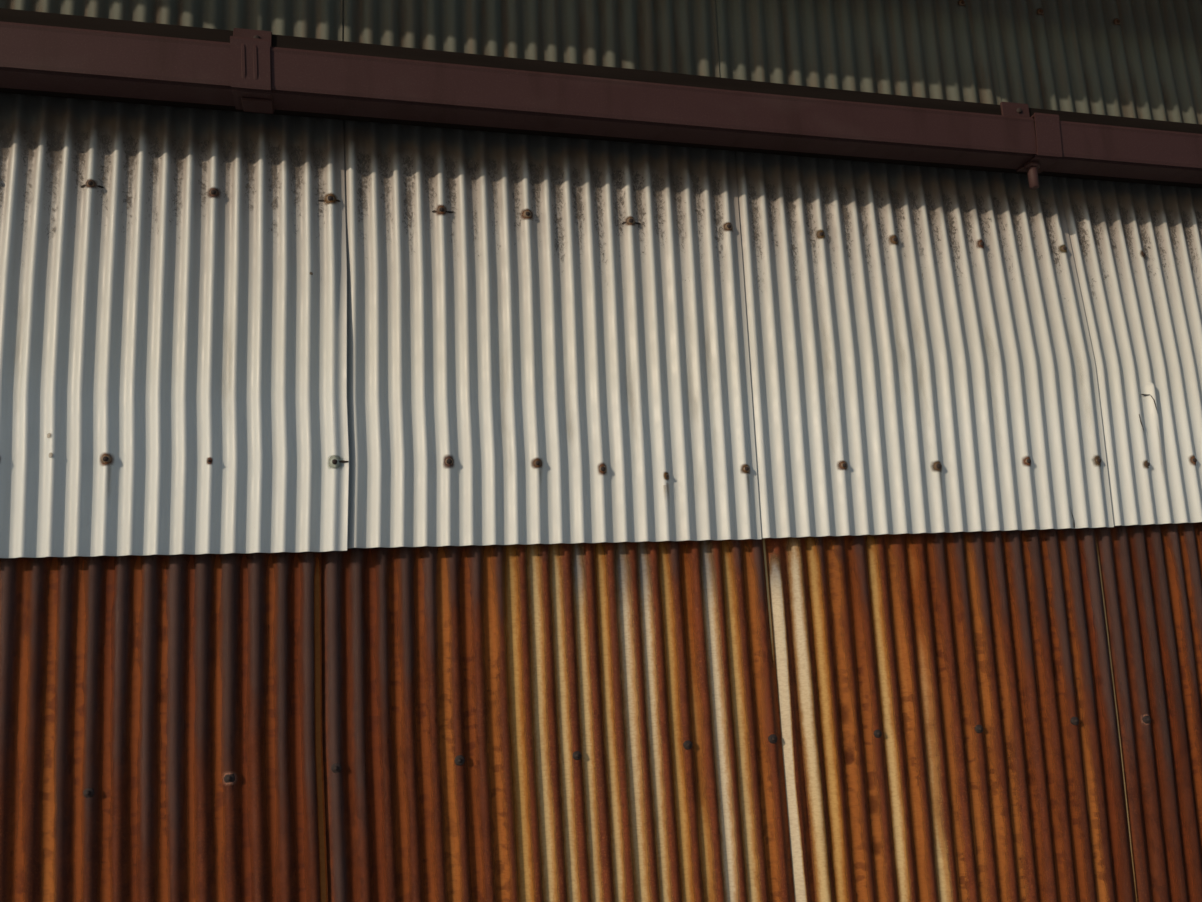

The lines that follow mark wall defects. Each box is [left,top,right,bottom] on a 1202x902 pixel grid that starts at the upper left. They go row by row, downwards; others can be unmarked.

leakage [0,126,185,235]
leakage [199,140,325,217]
leakage [357,153,723,263]
leakage [749,184,1061,286]
leakage [1073,204,1202,295]
rust [12,557,60,902]
rust [72,556,88,902]
rust [98,556,116,902]
rust [156,554,198,902]
rust [212,552,309,902]
rust [344,539,781,902]
rust [788,523,1202,902]